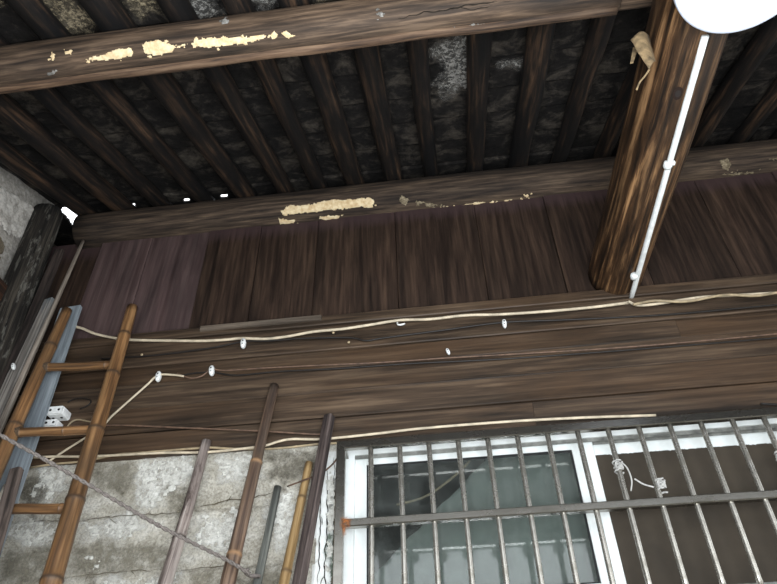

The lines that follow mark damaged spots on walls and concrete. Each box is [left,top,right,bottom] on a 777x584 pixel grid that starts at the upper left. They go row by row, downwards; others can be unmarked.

peeling [86,47,133,63]
peeling [142,31,295,58]
peeling [720,158,761,176]
flaking render [0,187,34,259]
peeling [279,197,377,225]
peeling [399,195,455,208]
crack [317,458,335,584]